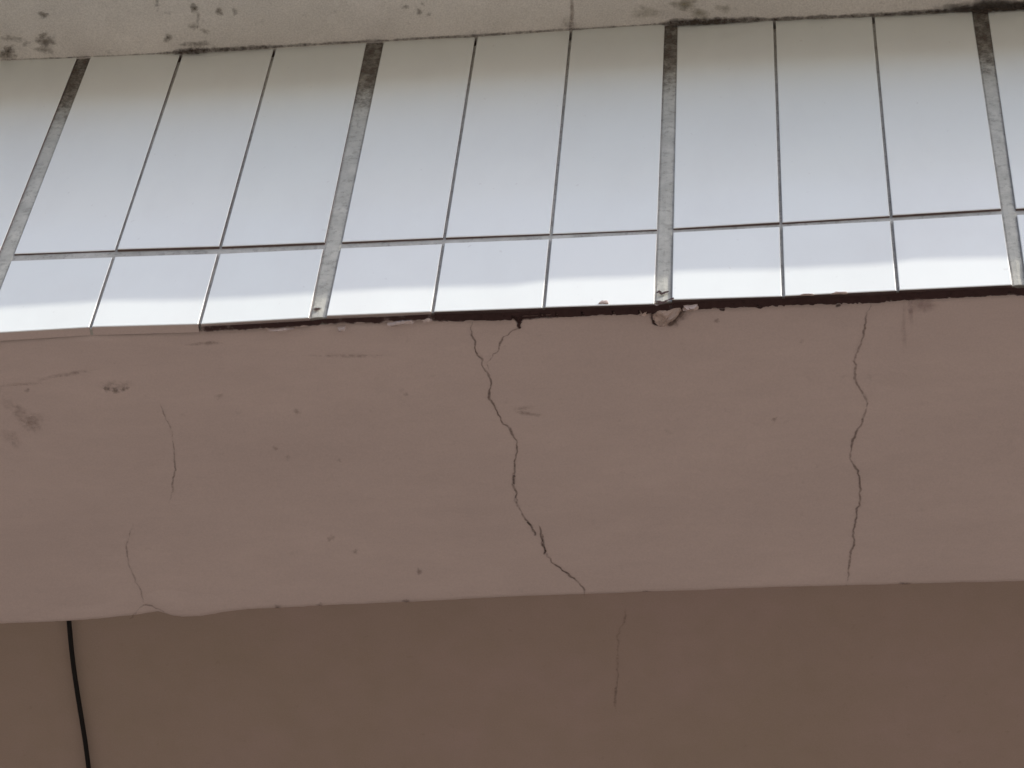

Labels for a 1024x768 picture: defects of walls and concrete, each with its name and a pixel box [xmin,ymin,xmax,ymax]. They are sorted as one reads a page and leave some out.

spalling [640,290,699,327]